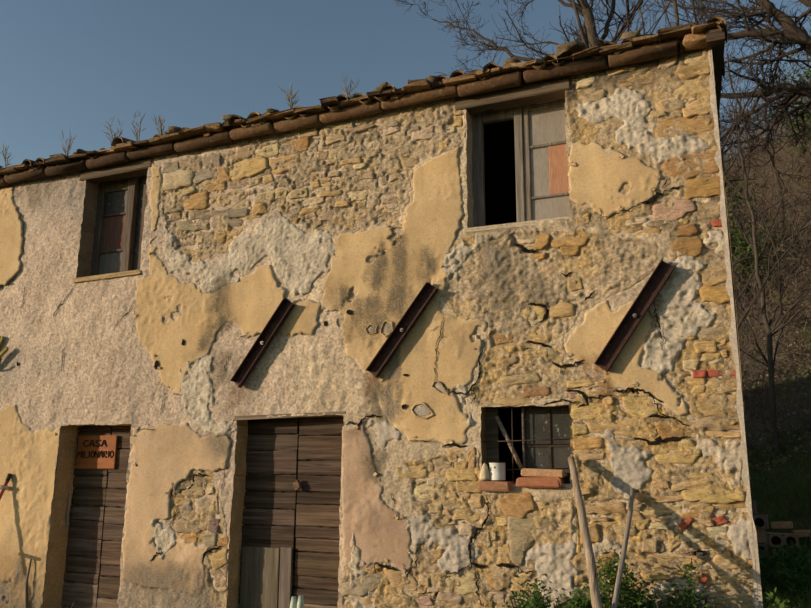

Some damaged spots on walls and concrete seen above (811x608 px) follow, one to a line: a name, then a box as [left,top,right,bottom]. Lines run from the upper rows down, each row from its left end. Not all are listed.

leakage [339,234,407,340]
flaking render [122,49,755,608]
crack [430,314,488,403]
crack [374,549,418,575]
crack [435,494,534,608]